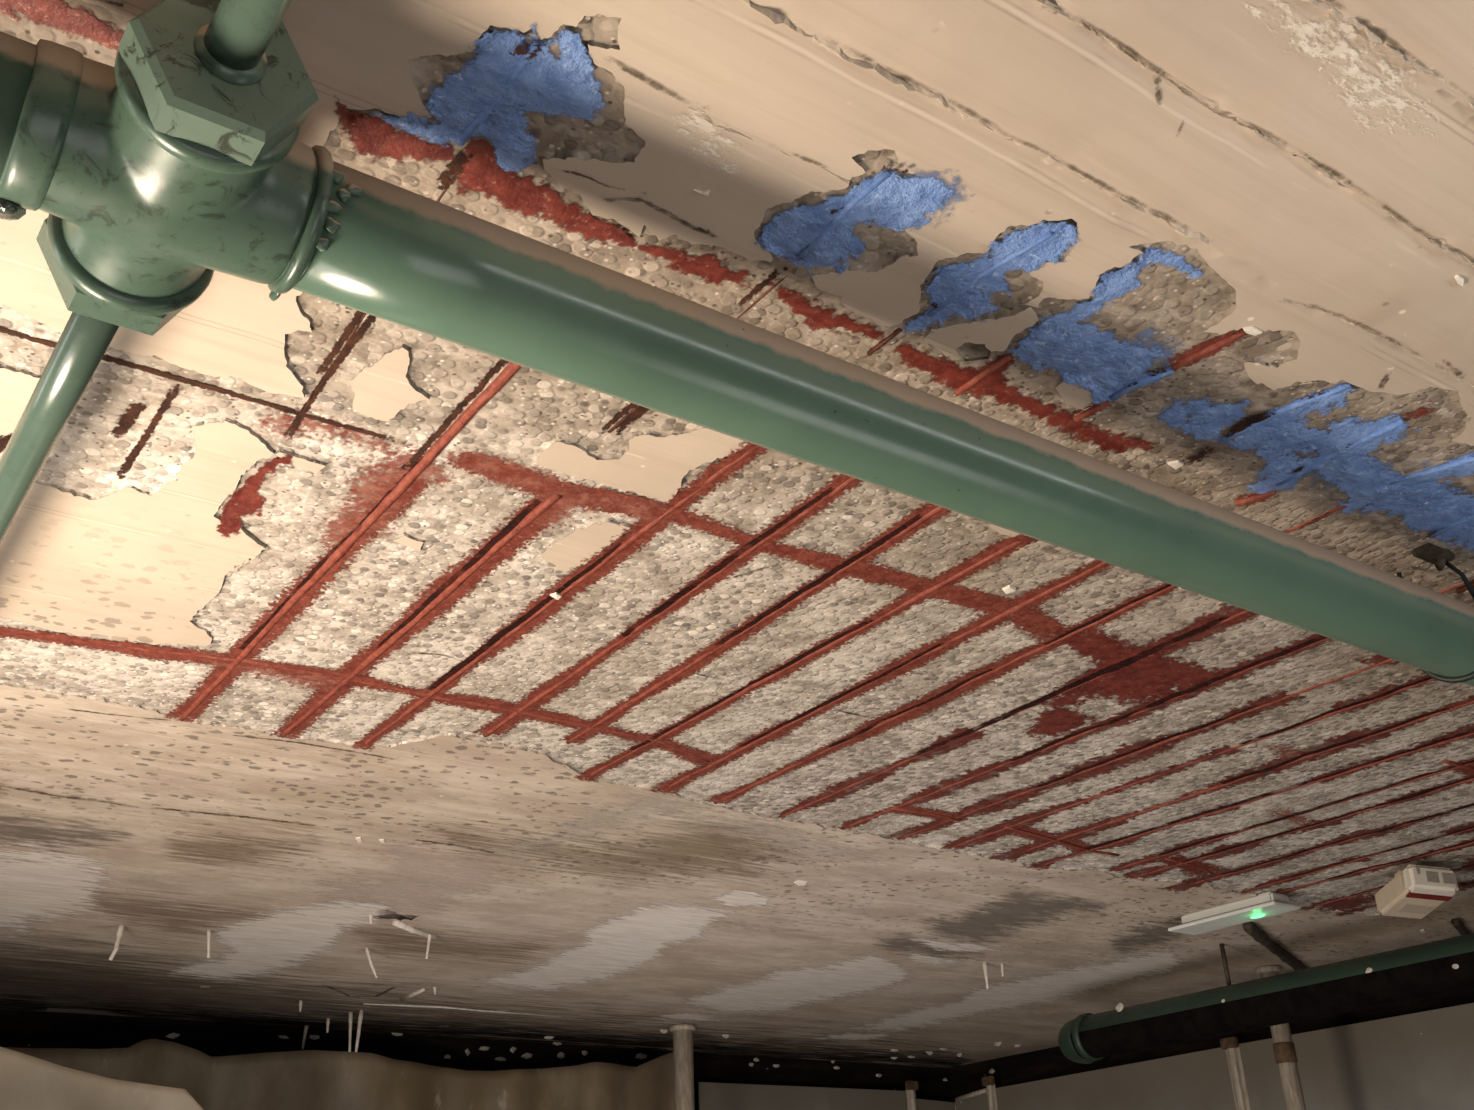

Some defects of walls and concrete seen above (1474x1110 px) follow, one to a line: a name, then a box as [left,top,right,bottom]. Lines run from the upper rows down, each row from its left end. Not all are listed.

corrosion [436,148,473,190]
corrosion [0,327,56,348]
spalling [323,14,1474,606]
corrosion [102,311,394,480]
corrosion [400,359,509,470]
corrosion [601,403,649,435]
spalling [0,292,1474,916]
water stain [0,817,128,852]
water stain [177,836,309,862]
water stain [325,788,876,959]
water stain [879,892,1103,959]
water stain [1113,919,1182,951]